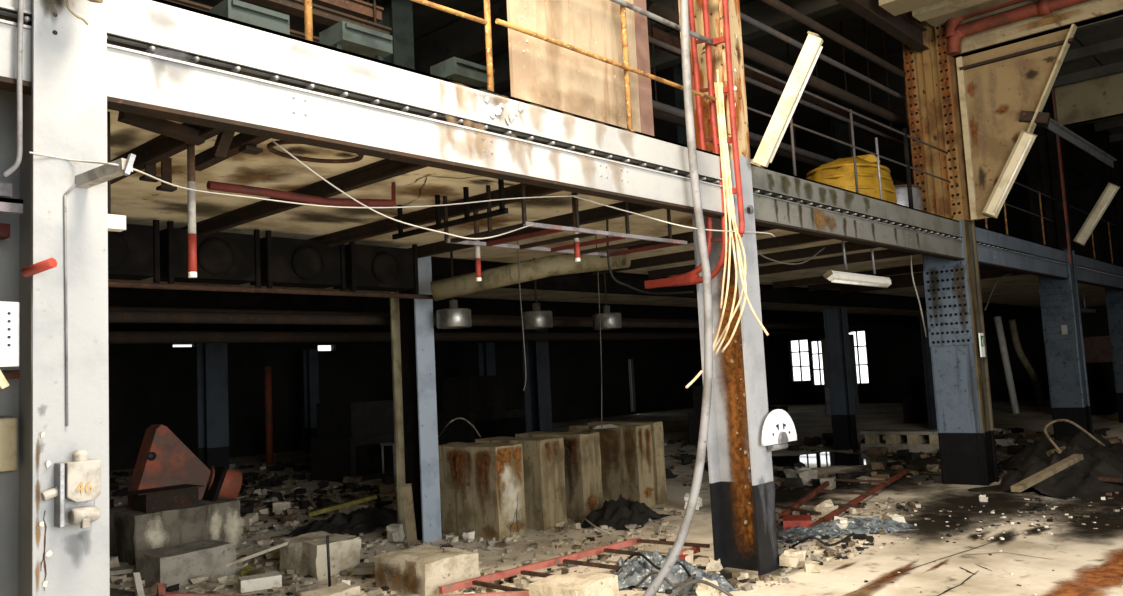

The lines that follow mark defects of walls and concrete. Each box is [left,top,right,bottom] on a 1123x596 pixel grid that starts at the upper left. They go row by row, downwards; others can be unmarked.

corrosion [904,44,926,204]
water stain [402,187,462,203]
water stain [514,198,572,207]
water stain [768,174,869,238]
corrosion [719,253,751,529]
corrosion [448,447,522,506]
corrosion [545,429,650,494]
water stain [774,435,1123,544]
corrosion [1046,549,1123,596]